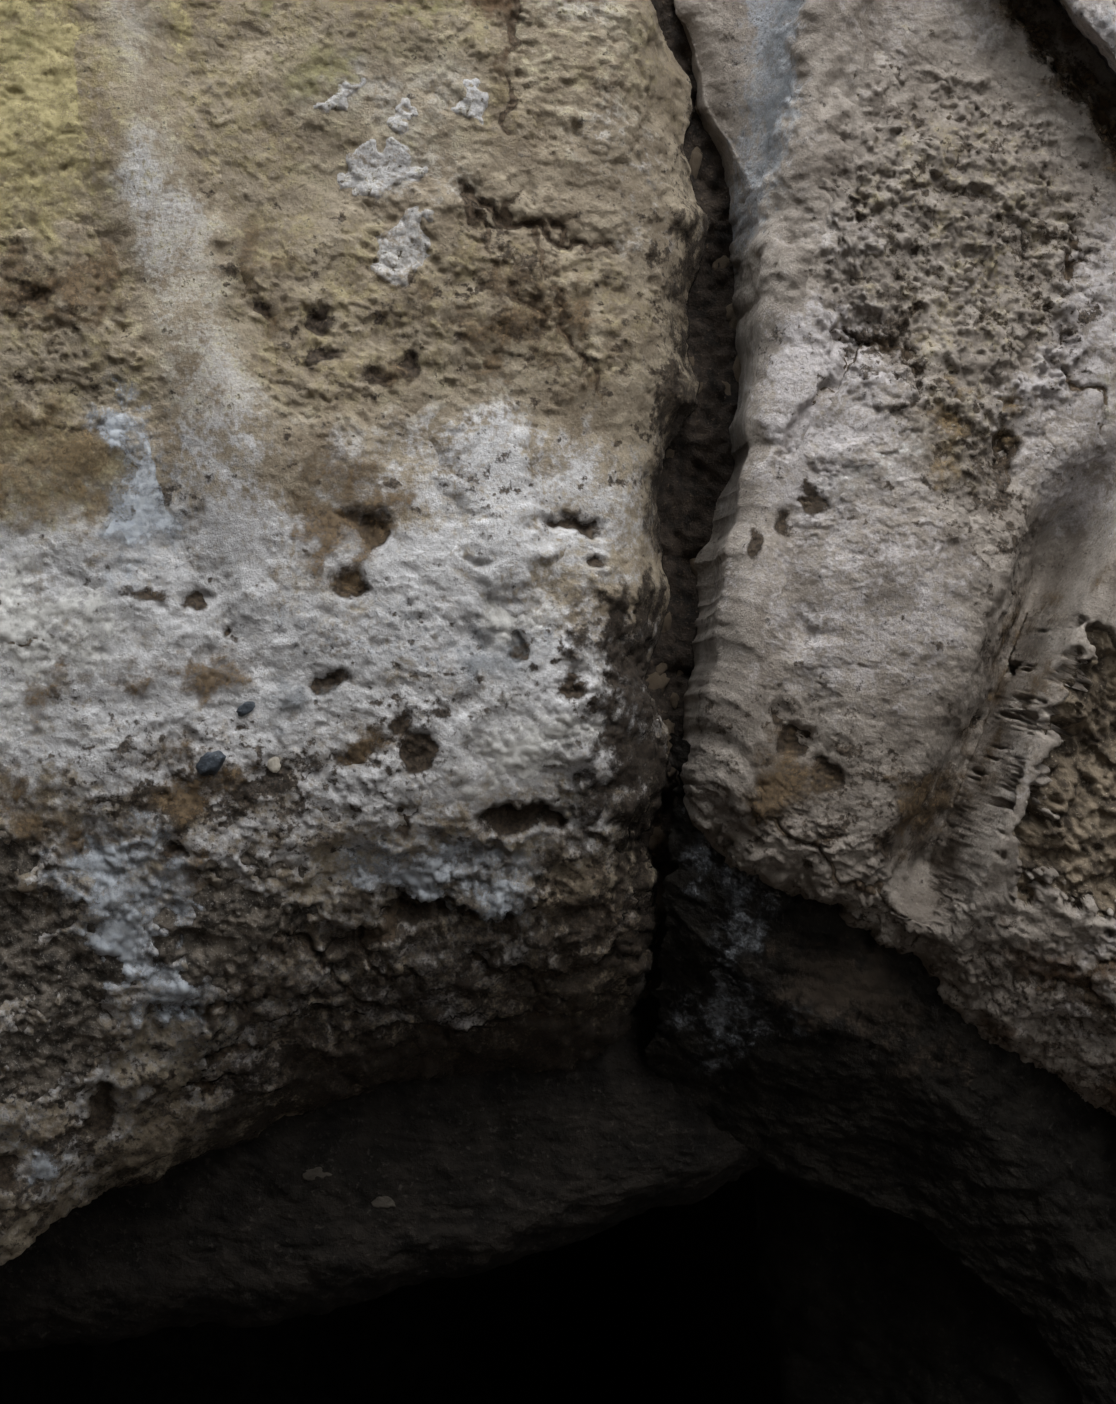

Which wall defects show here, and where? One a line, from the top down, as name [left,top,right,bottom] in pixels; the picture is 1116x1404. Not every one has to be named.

water stain [744,728,834,819]
water stain [884,587,1067,860]
spalling [1012,626,1116,920]